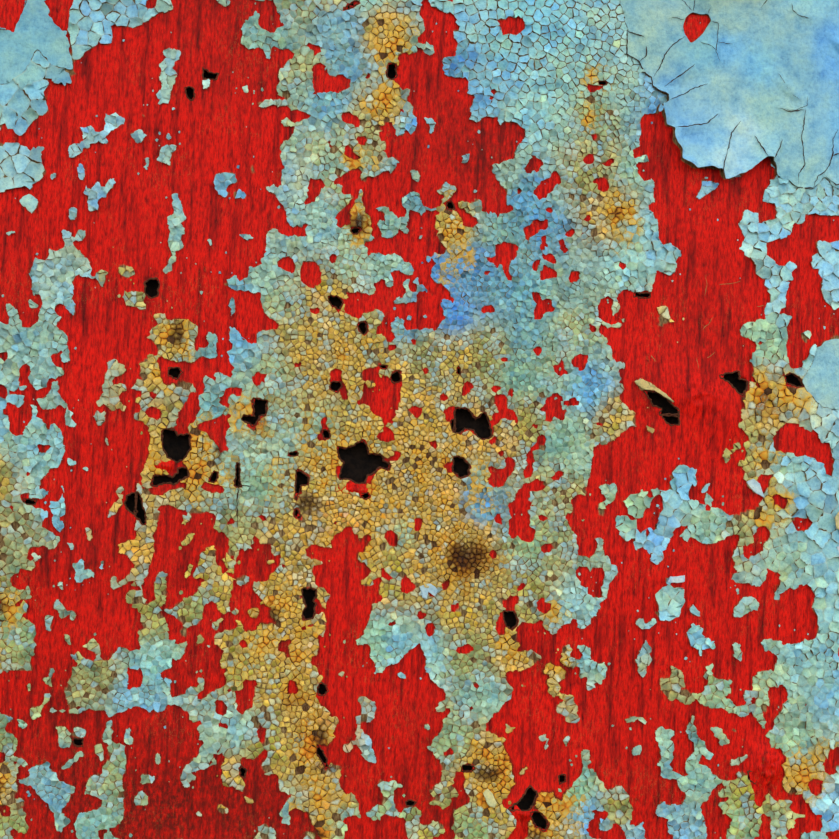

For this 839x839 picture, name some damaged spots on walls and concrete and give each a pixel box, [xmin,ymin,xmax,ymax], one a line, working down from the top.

crack [626,0,730,103]
peeling [0,50,72,213]
crack [755,74,839,189]
peeling [0,230,108,673]
peeling [50,0,681,839]
peeling [30,668,55,720]
peeling [0,713,75,839]